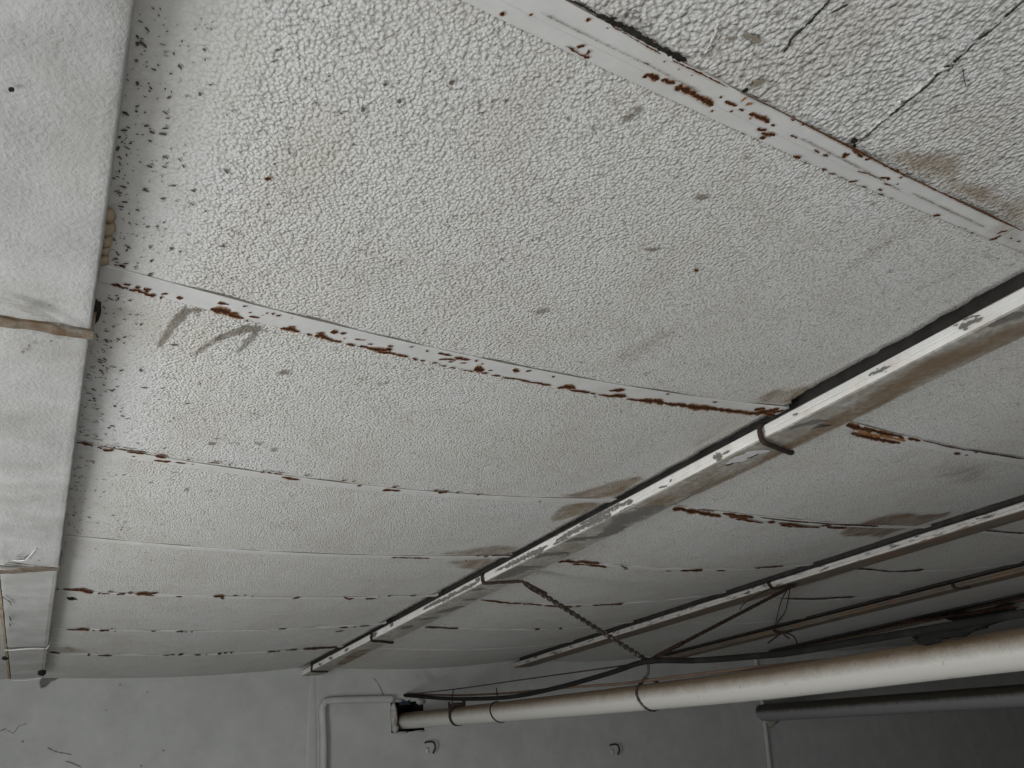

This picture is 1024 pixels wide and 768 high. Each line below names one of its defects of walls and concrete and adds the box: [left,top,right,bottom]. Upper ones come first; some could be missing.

crack [543,13,700,92]
crack [783,0,848,53]
rust [606,26,1023,242]
crack [800,0,1024,227]
rust [111,283,183,300]
rust [210,301,784,417]
rust [76,442,194,465]
rust [846,422,1023,459]
rust [672,506,879,529]
rust [57,588,157,596]